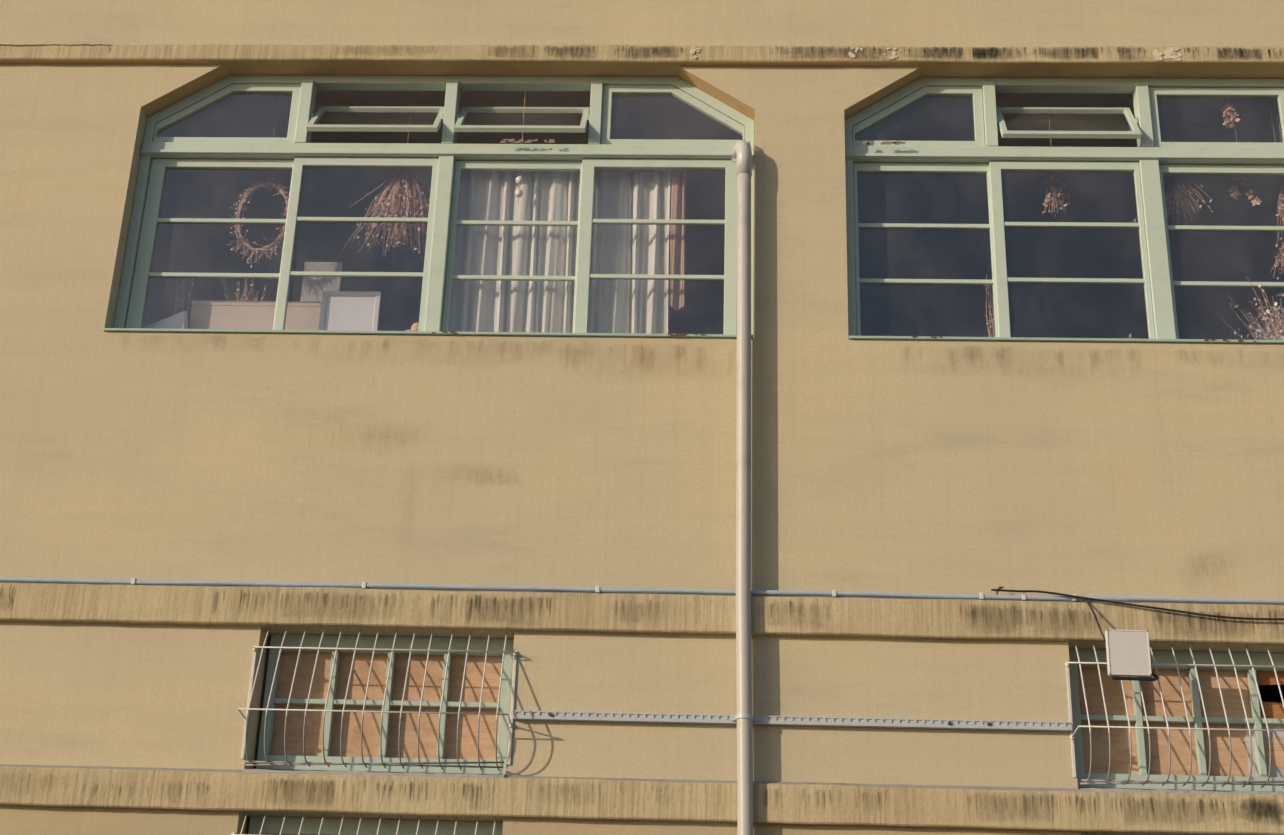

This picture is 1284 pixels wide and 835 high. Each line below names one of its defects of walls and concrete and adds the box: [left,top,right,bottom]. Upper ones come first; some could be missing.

leakage [924,48,1004,58]
leakage [1219,48,1270,58]